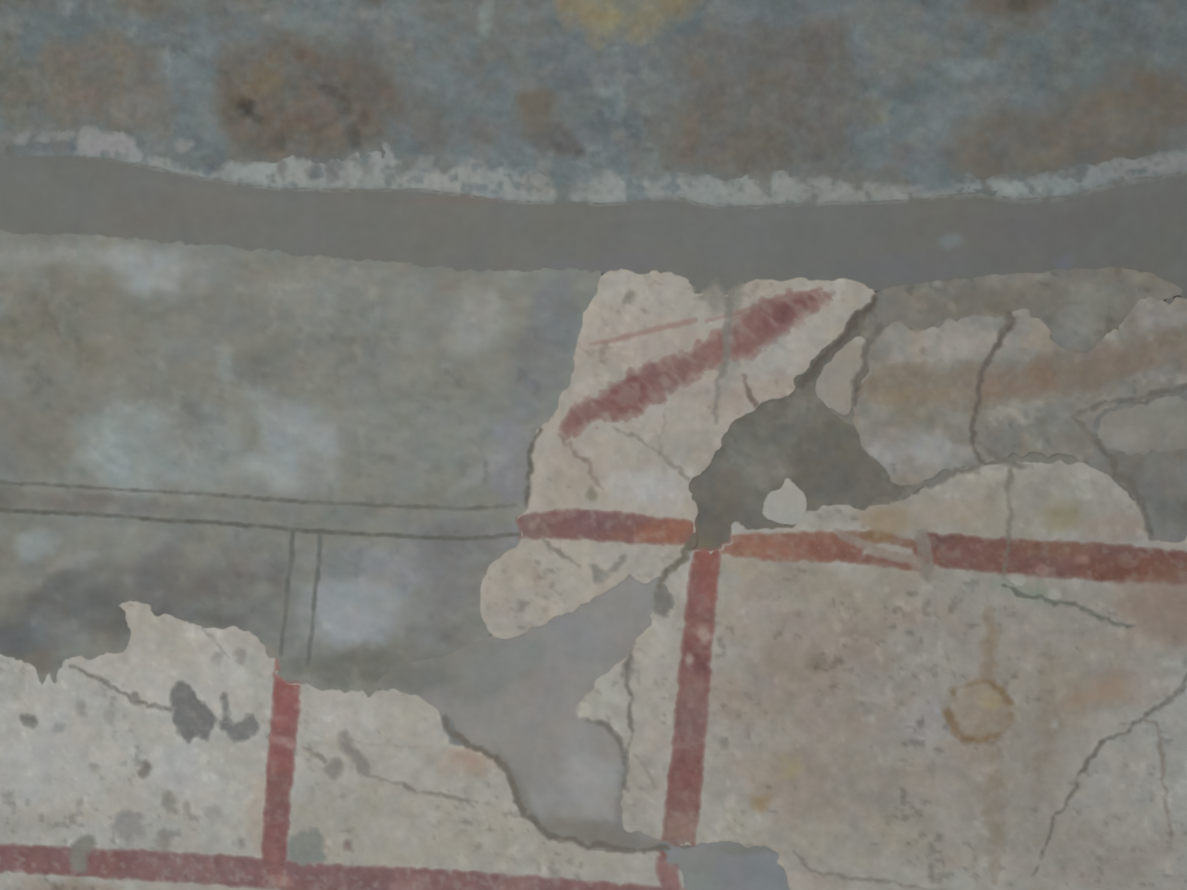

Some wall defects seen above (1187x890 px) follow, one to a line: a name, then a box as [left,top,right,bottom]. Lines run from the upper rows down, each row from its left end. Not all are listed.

damp [974,0,1058,36]
damp [10,52,1187,210]
crack [897,309,1137,629]
crack [1070,381,1187,538]
spalling [588,553,628,585]
crack [833,527,936,583]
spalling [652,584,675,619]
spalling [321,728,372,781]
crack [1031,672,1187,877]
spalling [285,825,327,867]
crack [792,849,945,890]